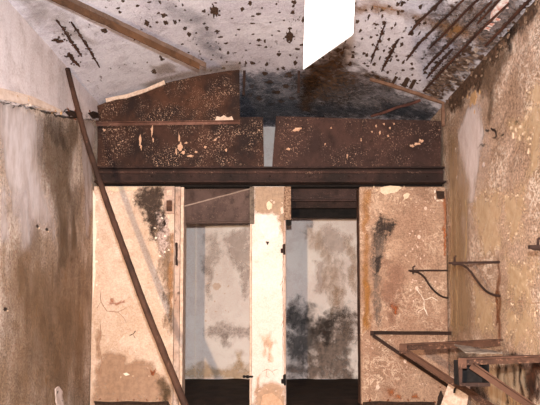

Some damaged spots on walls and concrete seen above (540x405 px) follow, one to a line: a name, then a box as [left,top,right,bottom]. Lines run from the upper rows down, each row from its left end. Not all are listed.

spalling [51,19,100,68]
spalling [144,12,197,37]
spalling [249,27,295,48]
leakage [482,27,515,119]
peeling [362,0,540,250]
leakage [0,102,92,405]
leakage [135,186,174,330]
leakage [287,303,306,326]
leakage [322,318,352,345]